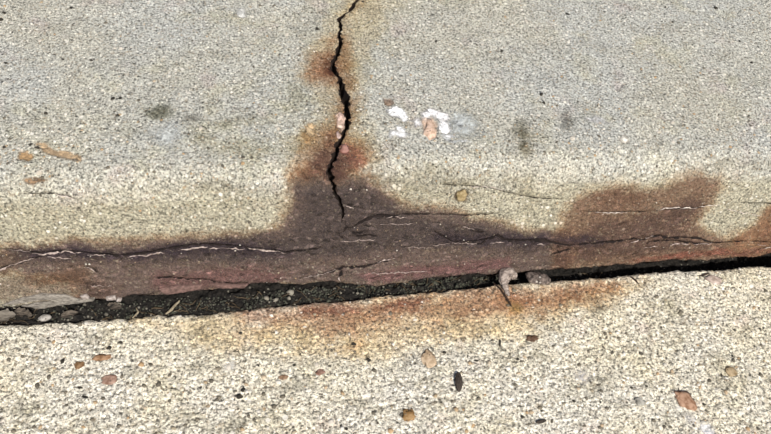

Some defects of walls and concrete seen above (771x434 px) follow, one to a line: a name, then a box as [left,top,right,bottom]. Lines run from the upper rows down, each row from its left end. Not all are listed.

crack [24,192,77,200]
crack [0,244,319,287]
rust [0,166,771,301]
crack [299,0,771,281]